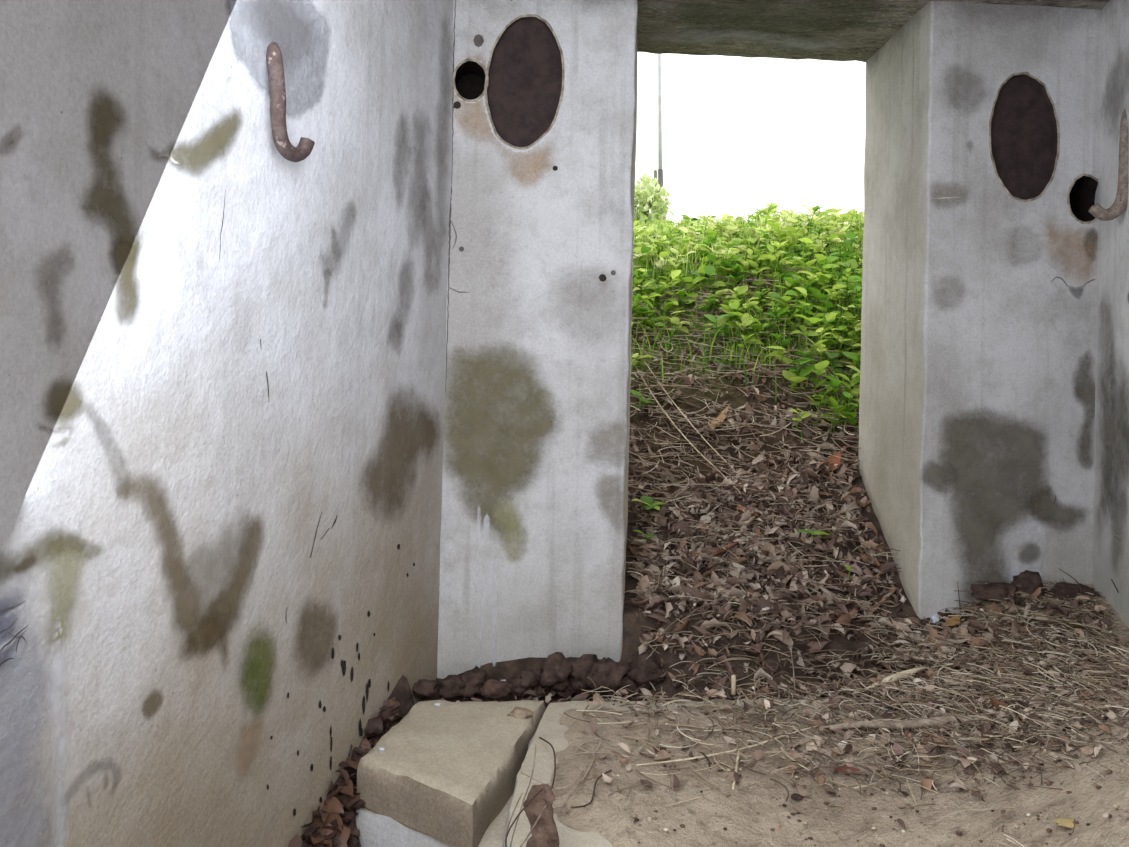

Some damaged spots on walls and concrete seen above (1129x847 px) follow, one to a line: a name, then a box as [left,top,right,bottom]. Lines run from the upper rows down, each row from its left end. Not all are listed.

water stain [83,95,138,317]
water stain [158,113,239,172]
water stain [47,383,82,443]
water stain [123,480,262,653]
water stain [367,351,554,558]
water stain [923,414,1083,601]
water stain [358,679,371,736]